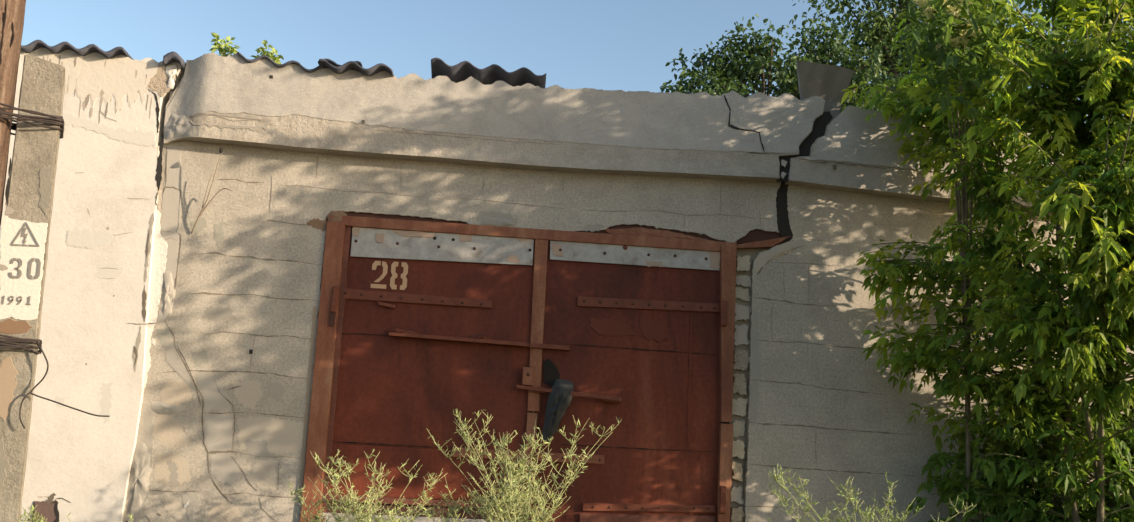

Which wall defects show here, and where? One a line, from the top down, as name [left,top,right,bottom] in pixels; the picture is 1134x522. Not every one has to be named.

corrosion [306,218,327,231]
peeling [139,209,168,422]
crack [75,74,318,522]
crack [218,96,913,522]
peeling [153,379,192,520]
peeling [202,499,245,522]
peeling [232,379,304,491]